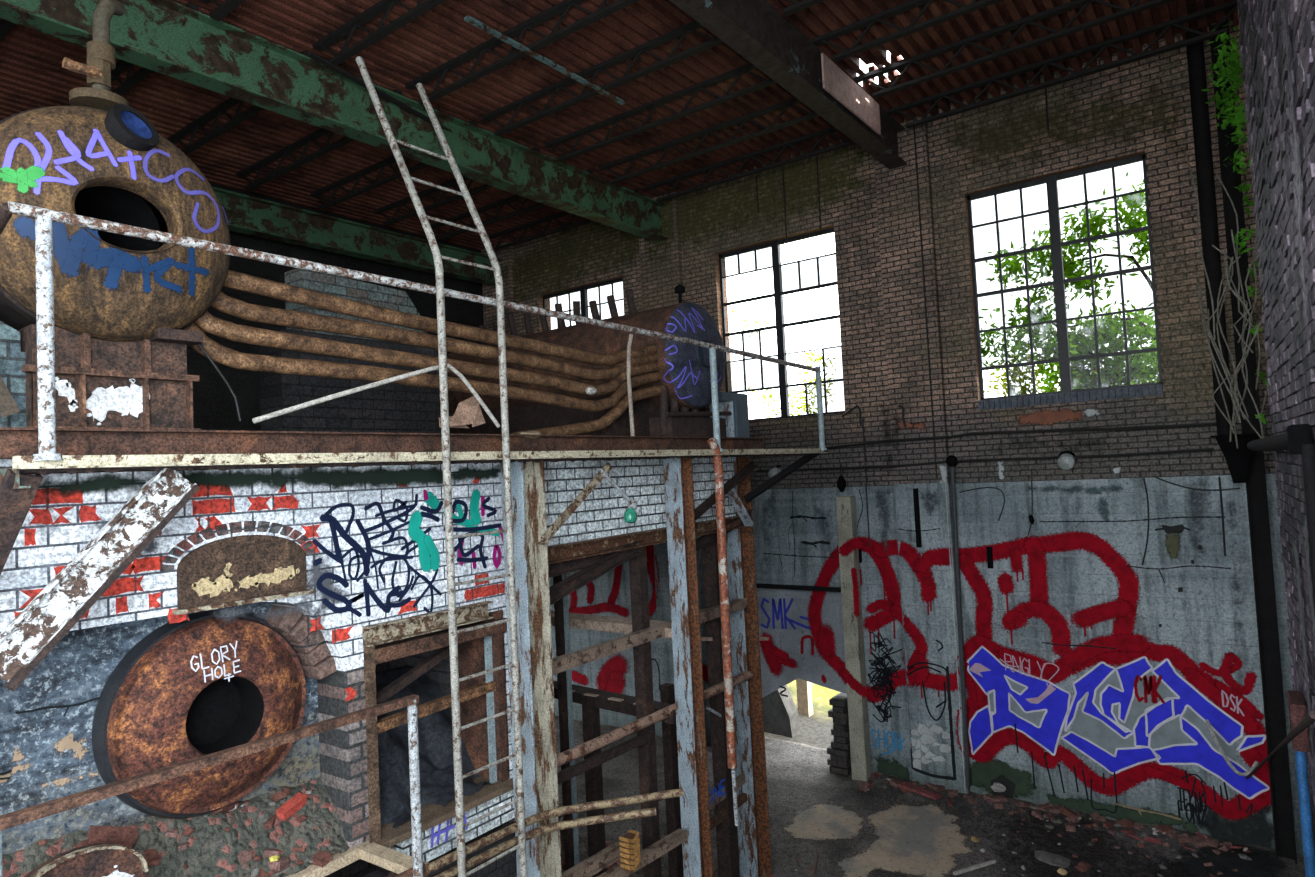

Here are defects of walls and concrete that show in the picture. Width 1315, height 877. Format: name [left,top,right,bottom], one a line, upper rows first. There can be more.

peeling [55,377,150,425]
peeling [19,453,819,546]
peeling [300,524,321,553]
peeling [14,588,44,618]
peeling [101,553,189,624]
peeling [191,562,300,598]
peeling [397,598,418,615]
peeling [464,573,505,601]
peeling [102,865,134,877]